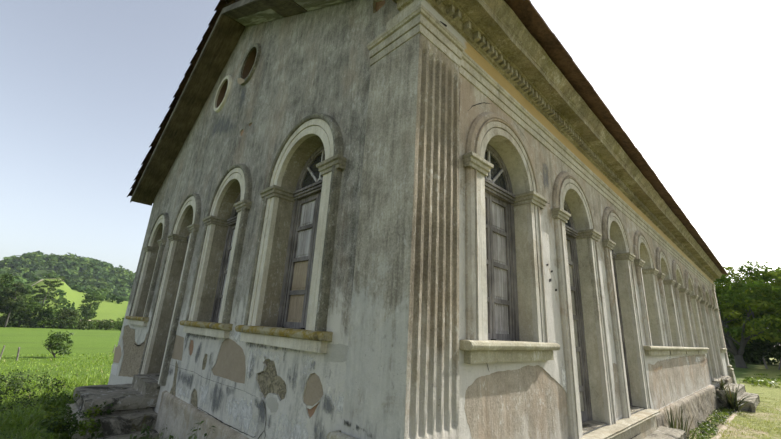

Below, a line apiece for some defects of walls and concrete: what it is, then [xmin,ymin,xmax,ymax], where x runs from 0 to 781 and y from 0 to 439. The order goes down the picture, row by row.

flaking render [111,325,148,378]
flaking render [202,338,246,384]
water stain [201,386,327,439]
flaking render [256,356,287,401]
flaking render [302,373,324,419]
flaking render [464,365,569,439]